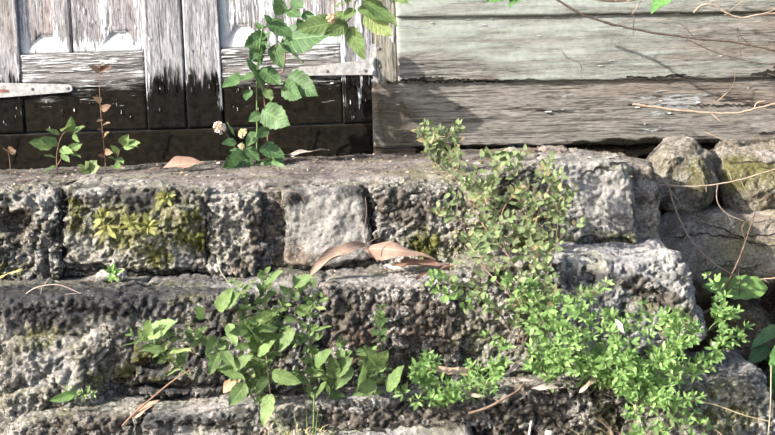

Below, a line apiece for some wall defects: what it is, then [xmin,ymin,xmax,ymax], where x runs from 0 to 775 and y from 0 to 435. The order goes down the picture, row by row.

peeling [355,0,363,36]
peeling [8,0,162,100]
crack [674,223,775,273]